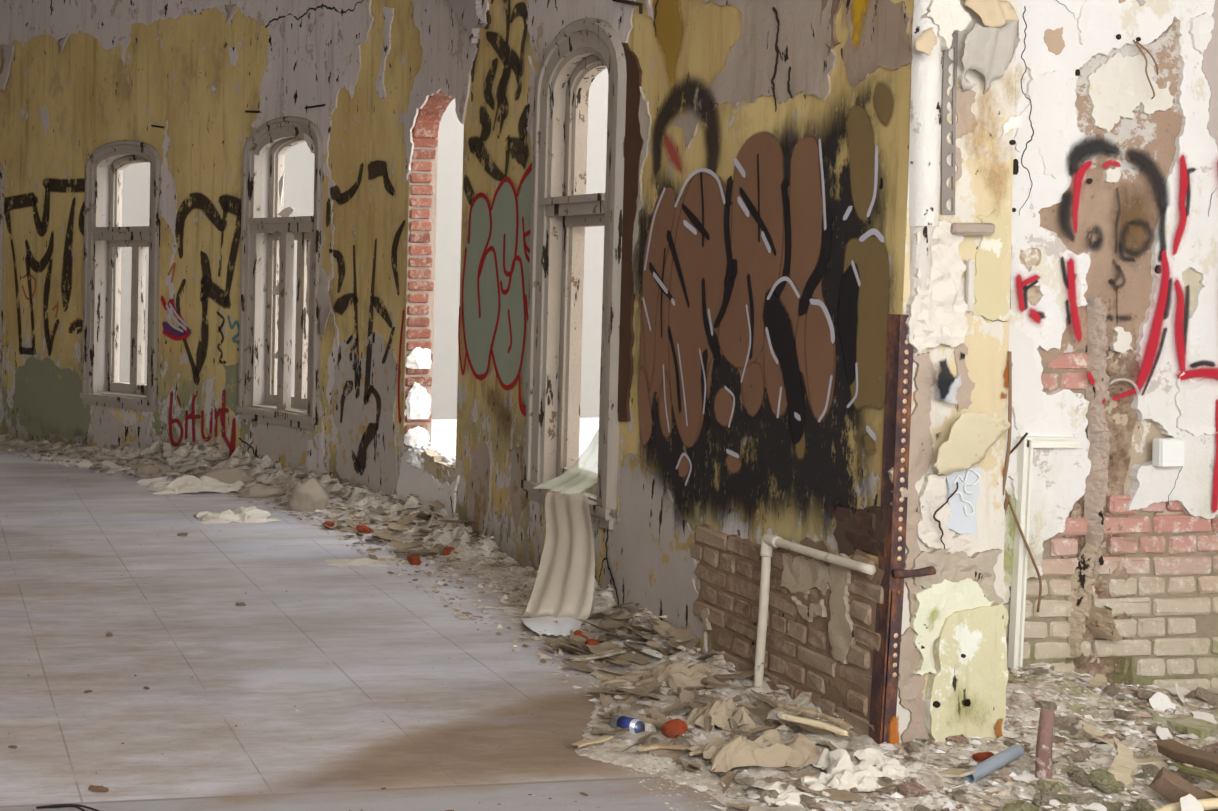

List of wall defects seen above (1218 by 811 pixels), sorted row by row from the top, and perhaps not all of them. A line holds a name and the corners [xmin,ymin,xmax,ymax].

crack [265,0,364,28]
flaking render [402,0,491,181]
crack [1019,6,1034,215]
flaking render [0,0,460,517]
flaking render [603,0,1218,745]
rust [891,566,936,594]
rust [889,716,899,744]